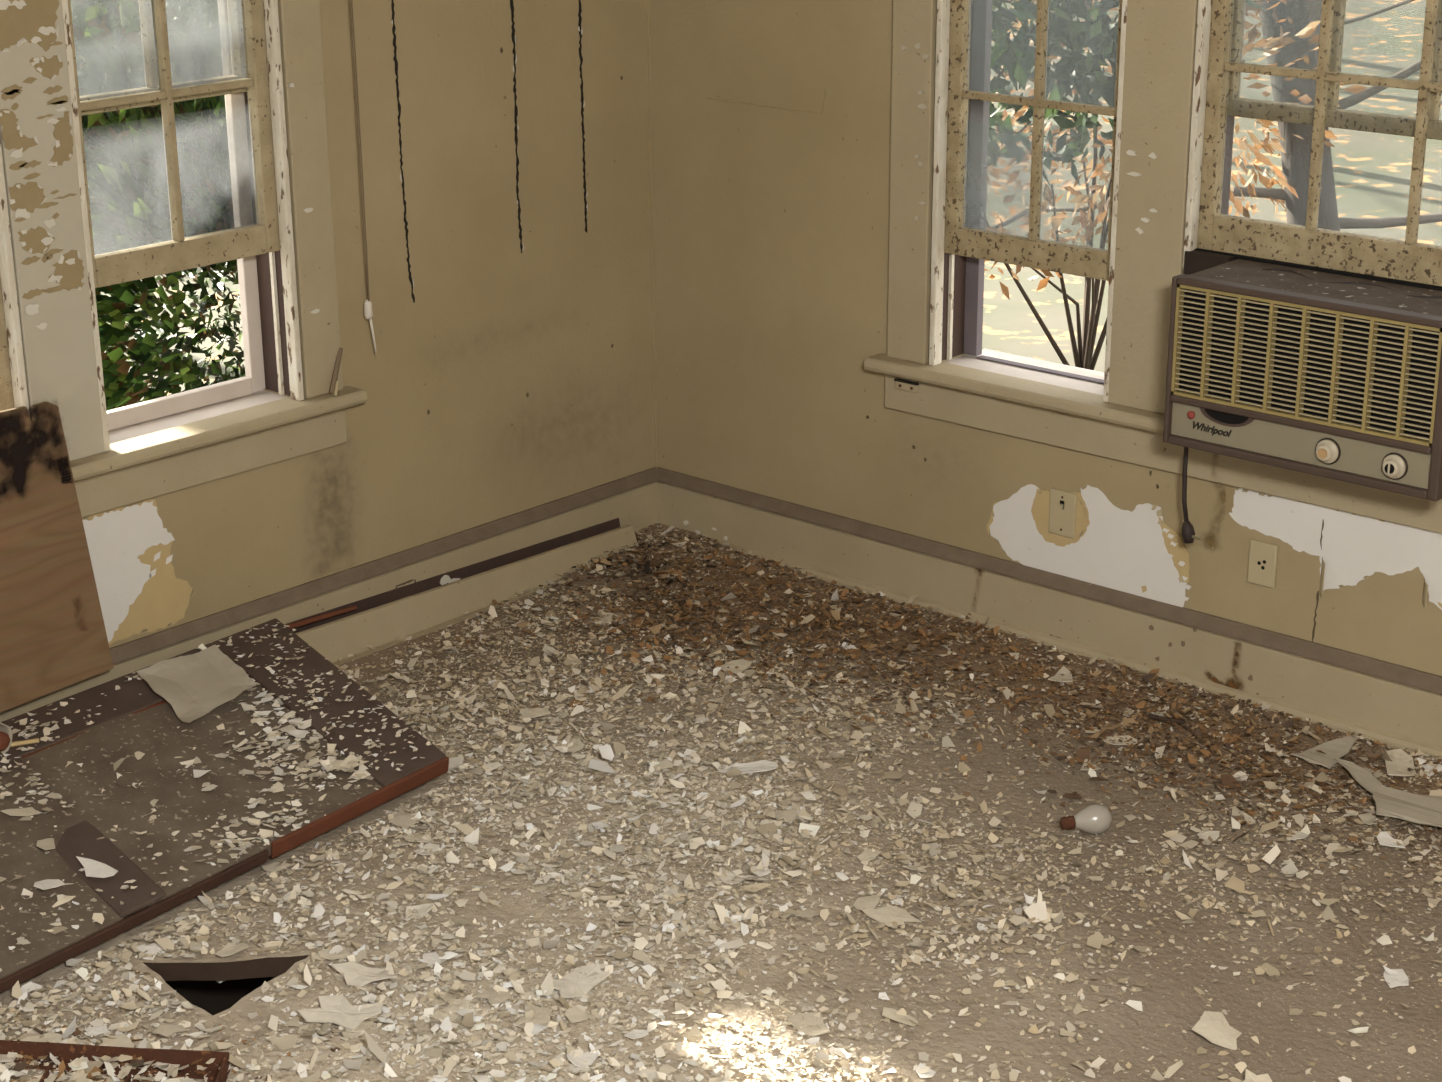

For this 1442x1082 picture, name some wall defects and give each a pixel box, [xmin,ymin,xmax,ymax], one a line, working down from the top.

peeling [0,0,85,330]
crack [391,0,415,303]
crack [510,0,524,253]
crack [578,0,588,233]
peeling [987,484,1191,608]
peeling [1225,485,1442,610]